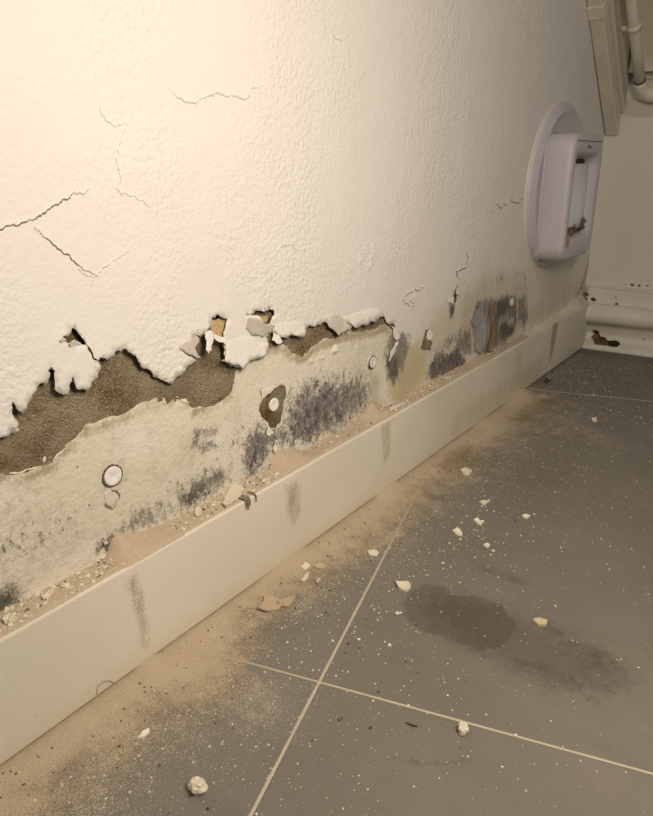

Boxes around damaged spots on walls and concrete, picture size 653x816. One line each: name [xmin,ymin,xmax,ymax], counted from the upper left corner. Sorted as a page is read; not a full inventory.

crack [173,84,264,105]
crack [99,107,150,207]
crack [0,187,133,286]
flaking render [421,329,432,351]
spalling [585,330,620,347]
flaking render [0,307,401,476]
mould [192,370,371,479]
mould [178,469,232,507]
mould [96,502,162,552]
mould [0,584,17,611]
flaking render [300,562,327,585]
flaking render [395,580,411,593]